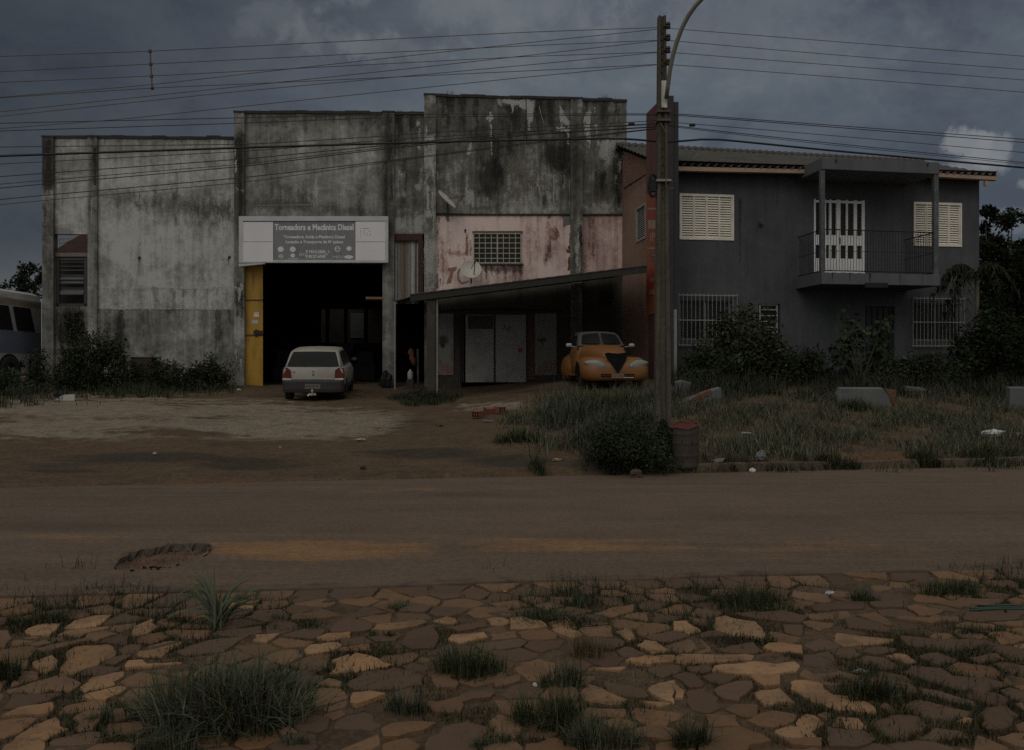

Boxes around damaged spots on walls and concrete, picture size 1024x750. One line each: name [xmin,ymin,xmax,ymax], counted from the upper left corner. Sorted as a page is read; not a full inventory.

damp [436,97,521,207]
peeling [497,98,536,131]
peeling [556,105,570,144]
damp [583,96,623,206]